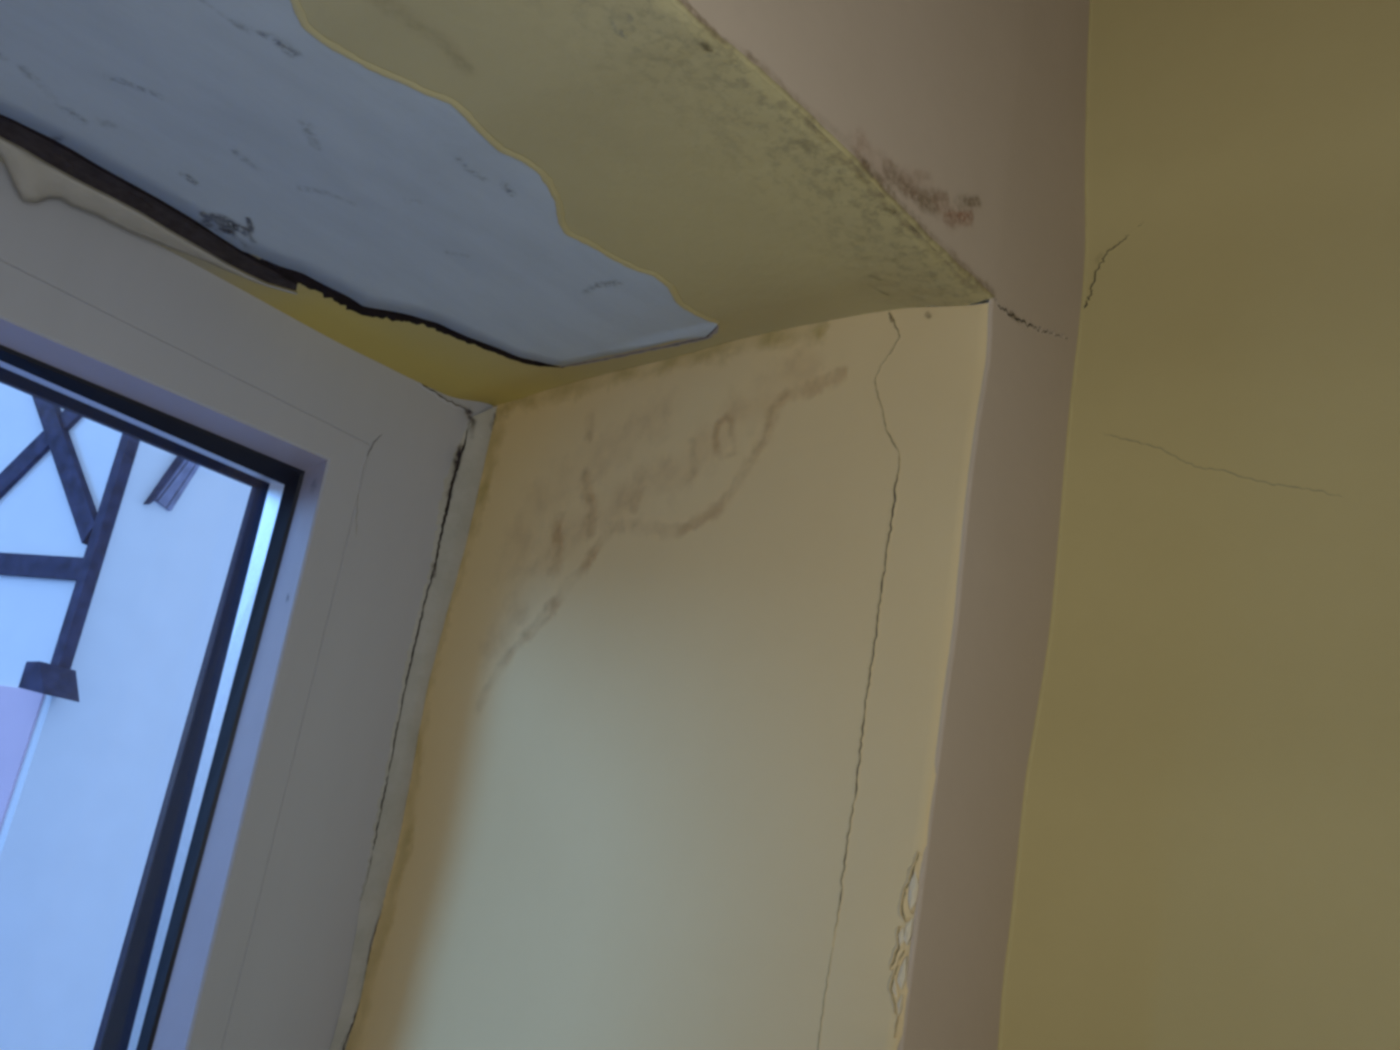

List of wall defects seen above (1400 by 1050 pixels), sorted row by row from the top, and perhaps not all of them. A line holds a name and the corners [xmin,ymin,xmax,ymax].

peeling [0,0,720,366]
crack [816,313,902,1050]
spalling [887,851,923,1038]